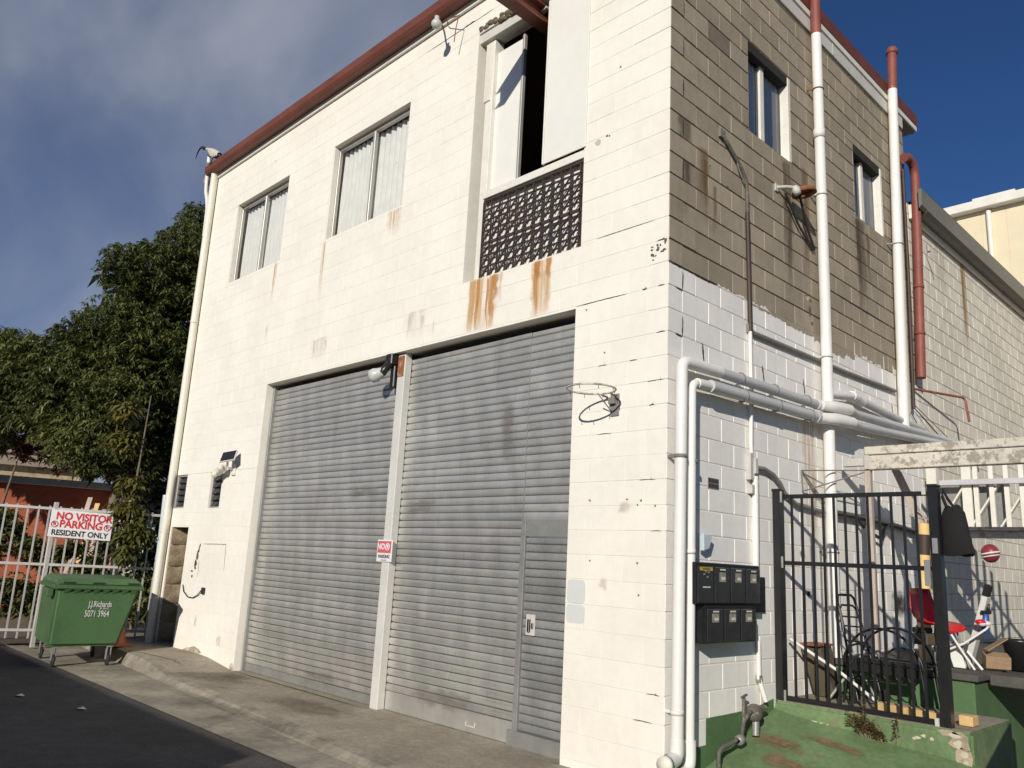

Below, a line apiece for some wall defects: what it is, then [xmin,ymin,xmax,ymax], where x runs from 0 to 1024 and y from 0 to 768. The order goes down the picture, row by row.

corrosion [468,274,497,319]
corrosion [532,257,551,302]
peeling [718,284,897,376]